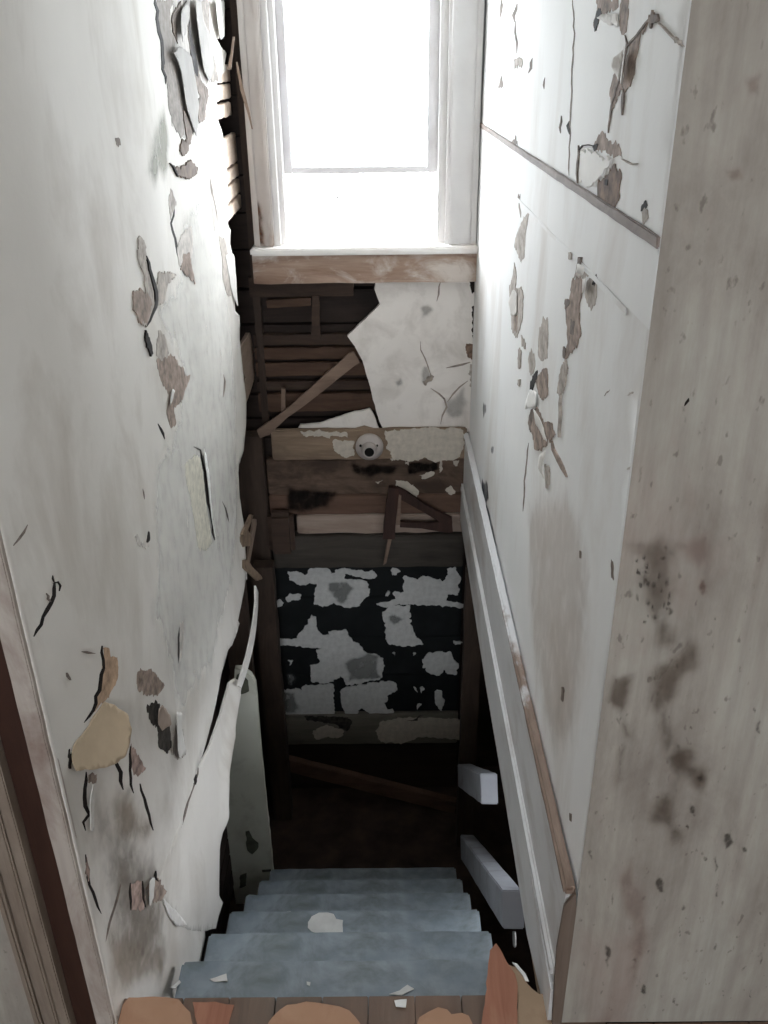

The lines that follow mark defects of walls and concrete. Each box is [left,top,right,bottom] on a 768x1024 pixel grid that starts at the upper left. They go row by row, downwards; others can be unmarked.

peeling [154,0,225,180]
spalling [576,0,685,207]
peeling [132,189,196,428]
peeling [508,194,597,489]
crack [185,447,229,551]
peeling [384,426,465,497]
crack [33,575,62,637]
peeling [68,646,154,830]
peeling [136,668,186,760]
peeling [277,567,463,744]
leakage [612,681,628,707]
leakage [656,651,694,706]